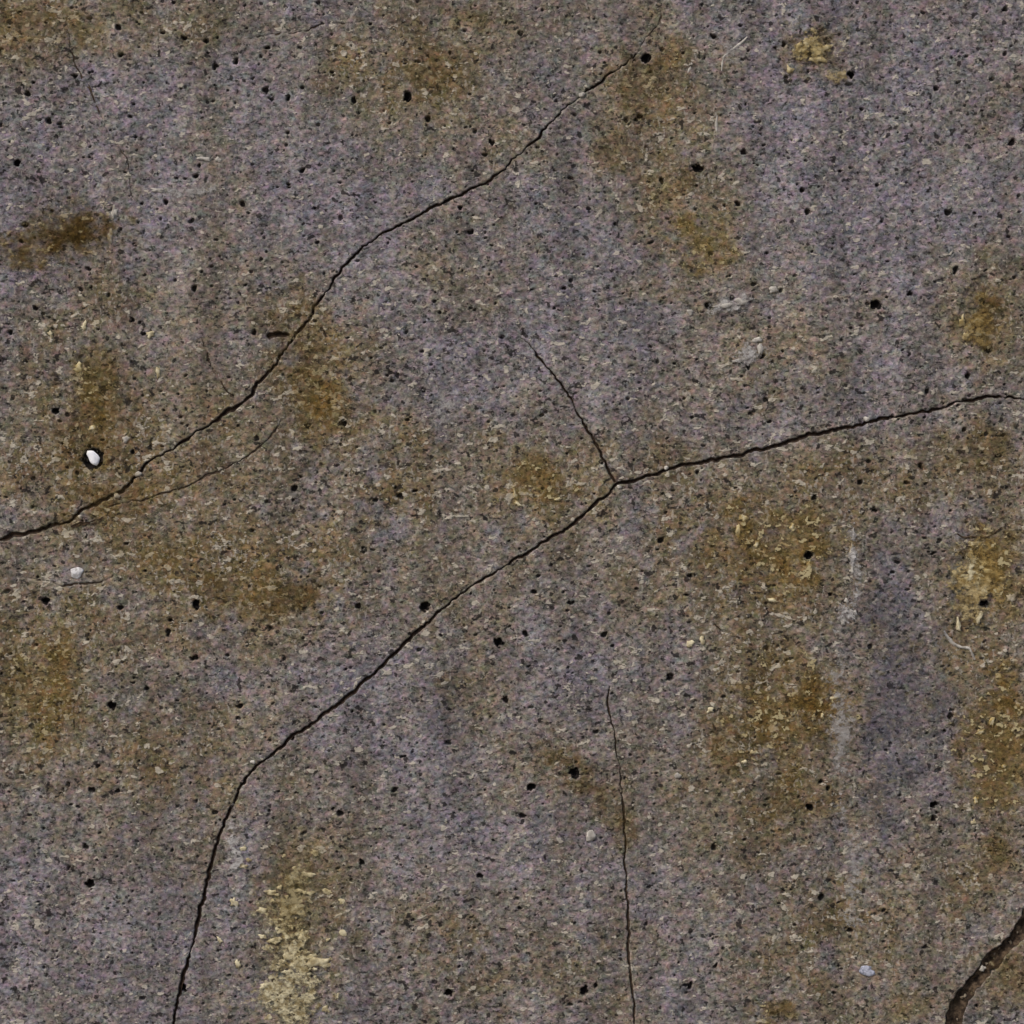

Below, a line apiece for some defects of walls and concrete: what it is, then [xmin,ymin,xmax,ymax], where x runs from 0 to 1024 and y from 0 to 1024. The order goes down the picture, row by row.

crack [0,11,662,541]
crack [173,338,1024,1024]